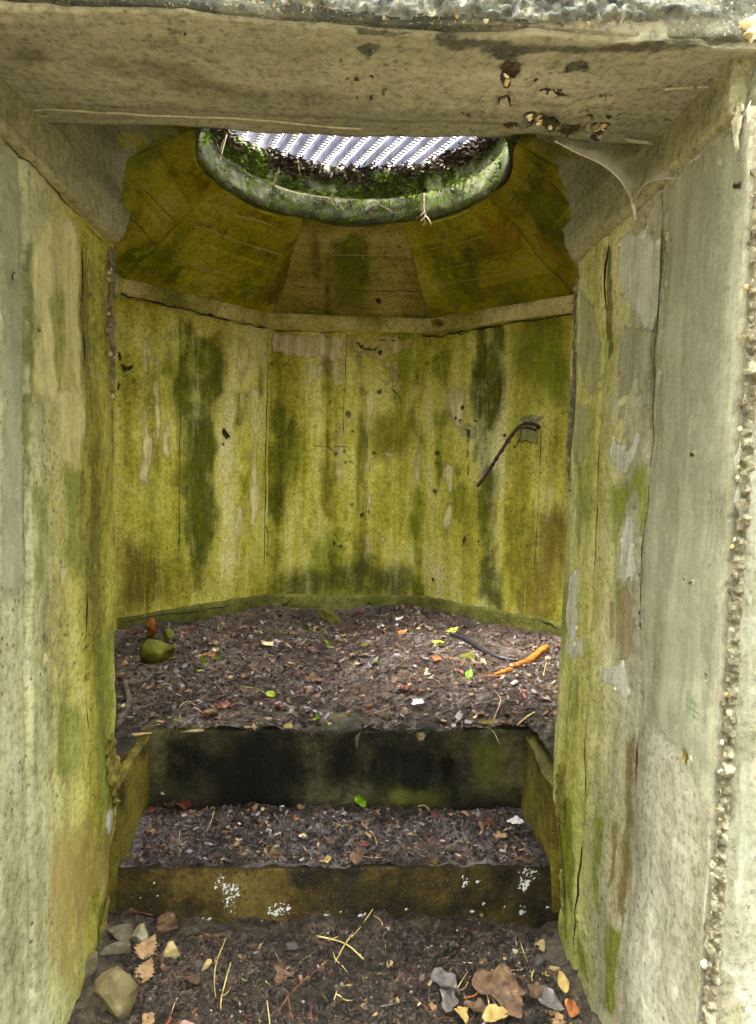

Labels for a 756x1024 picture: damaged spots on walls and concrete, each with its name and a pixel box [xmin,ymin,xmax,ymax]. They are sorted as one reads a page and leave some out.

spalling [499,60,521,98]
spalling [503,109,612,141]
crack [602,244,610,343]
peeling [272,333,413,392]
leakage [472,325,504,412]
leakage [191,422,217,560]
leakage [483,555,501,609]
peeling [566,570,583,659]
peeling [599,100,756,1024]
crack [583,672,591,793]
leakage [214,874,240,916]
crack [573,843,583,942]